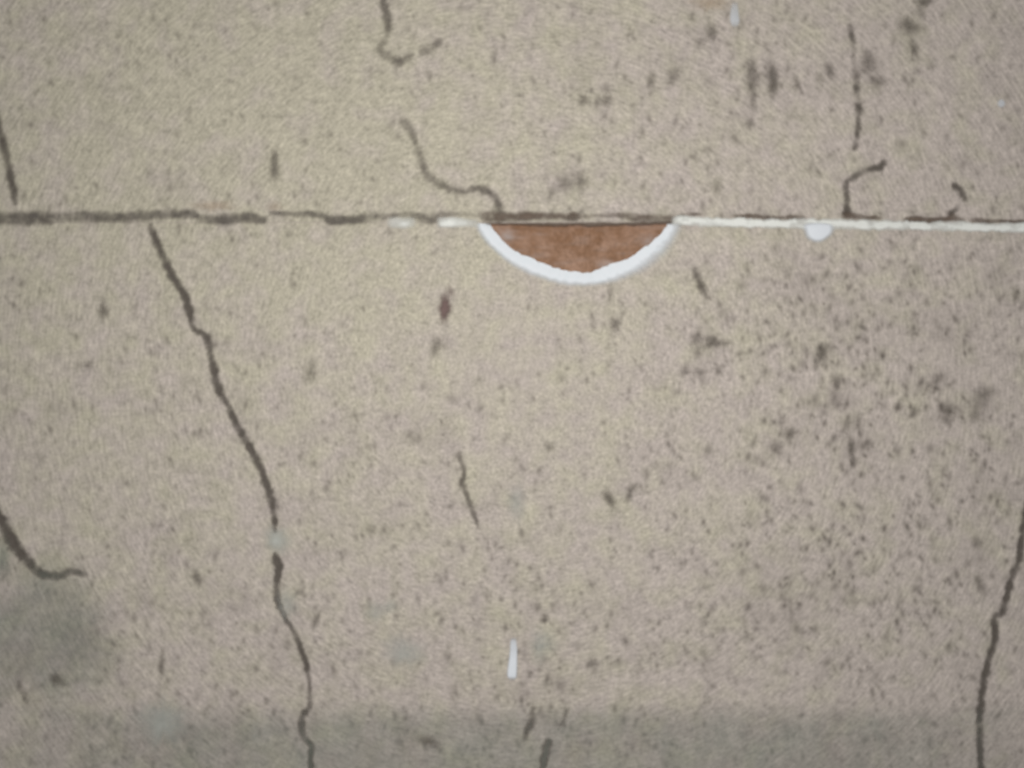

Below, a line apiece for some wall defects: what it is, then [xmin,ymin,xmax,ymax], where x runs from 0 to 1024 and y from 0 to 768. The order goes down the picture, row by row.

crack [382,0,390,29]
crack [0,131,17,199]
crack [474,187,501,207]
crack [844,75,886,213]
crack [949,184,966,215]
spalling [439,216,1024,285]
crack [150,229,277,526]
crack [0,512,82,578]
crack [273,553,313,768]
crack [977,511,1024,768]